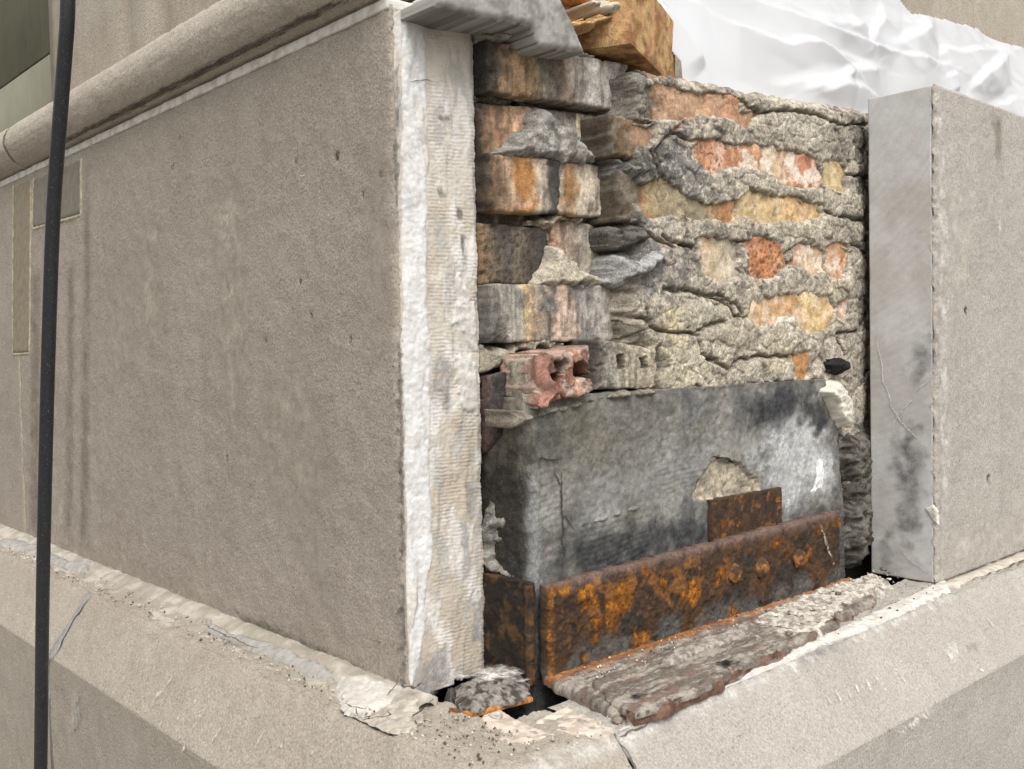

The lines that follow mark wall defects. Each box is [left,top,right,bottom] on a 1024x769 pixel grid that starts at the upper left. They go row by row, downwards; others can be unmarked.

spalling [499,340,656,409]
crack [538,457,574,569]
spalling [691,457,761,500]
water stain [746,417,834,508]
peeling [798,458,825,493]
corrosion [450,579,793,726]
spalling [350,698,424,735]